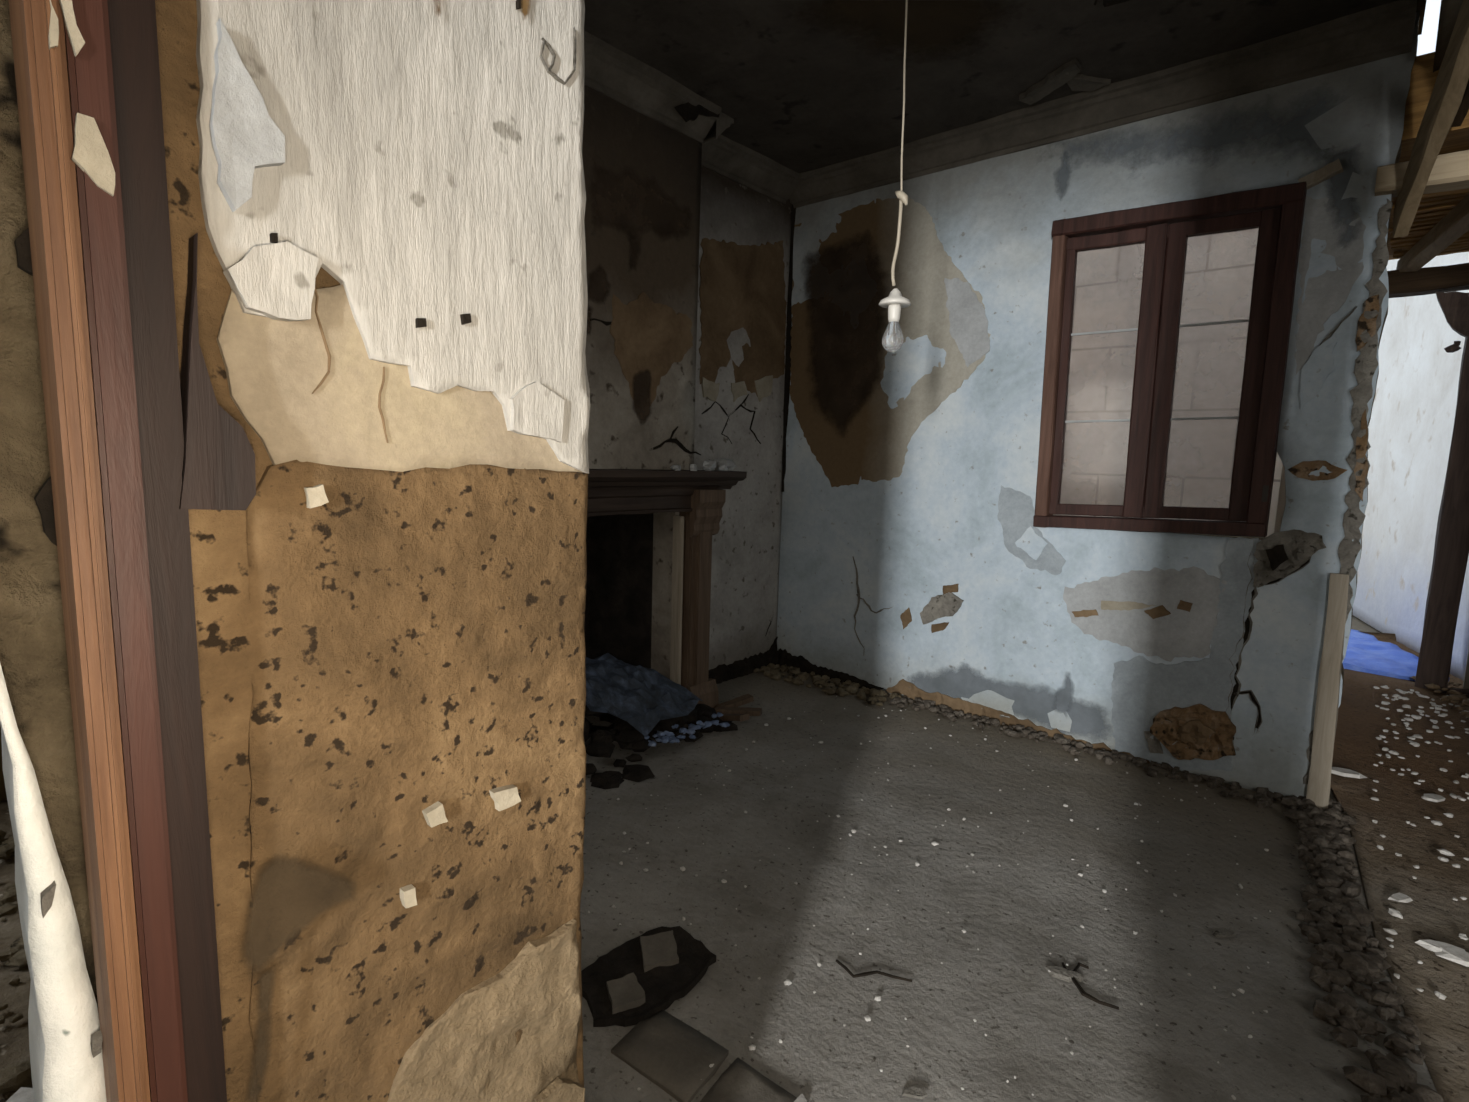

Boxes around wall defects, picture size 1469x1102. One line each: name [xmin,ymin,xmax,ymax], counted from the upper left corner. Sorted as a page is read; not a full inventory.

flaking render [196,0,991,1102]
crack [649,204,796,492]
peeling [886,196,1393,771]
crack [1225,543,1311,745]
spalling [1303,730,1313,784]